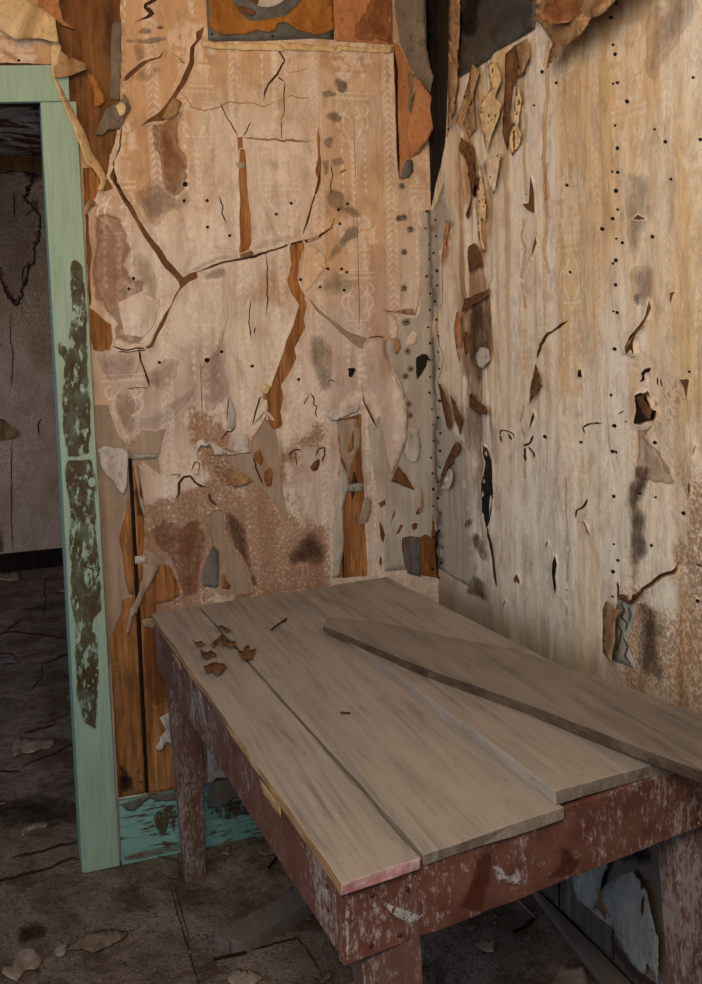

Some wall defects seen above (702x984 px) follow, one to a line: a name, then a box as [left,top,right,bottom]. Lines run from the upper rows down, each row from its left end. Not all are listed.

crack [135,0,160,25]
crack [183,42,307,140]
peeling [459,62,522,273]
crack [108,84,347,466]
peeling [454,312,491,369]
peeling [58,260,128,728]
crack [170,456,221,505]
peeling [362,337,414,489]
peeling [437,381,463,487]
peeling [602,601,620,663]
crack [170,885,199,984]
crack [253,937,323,977]